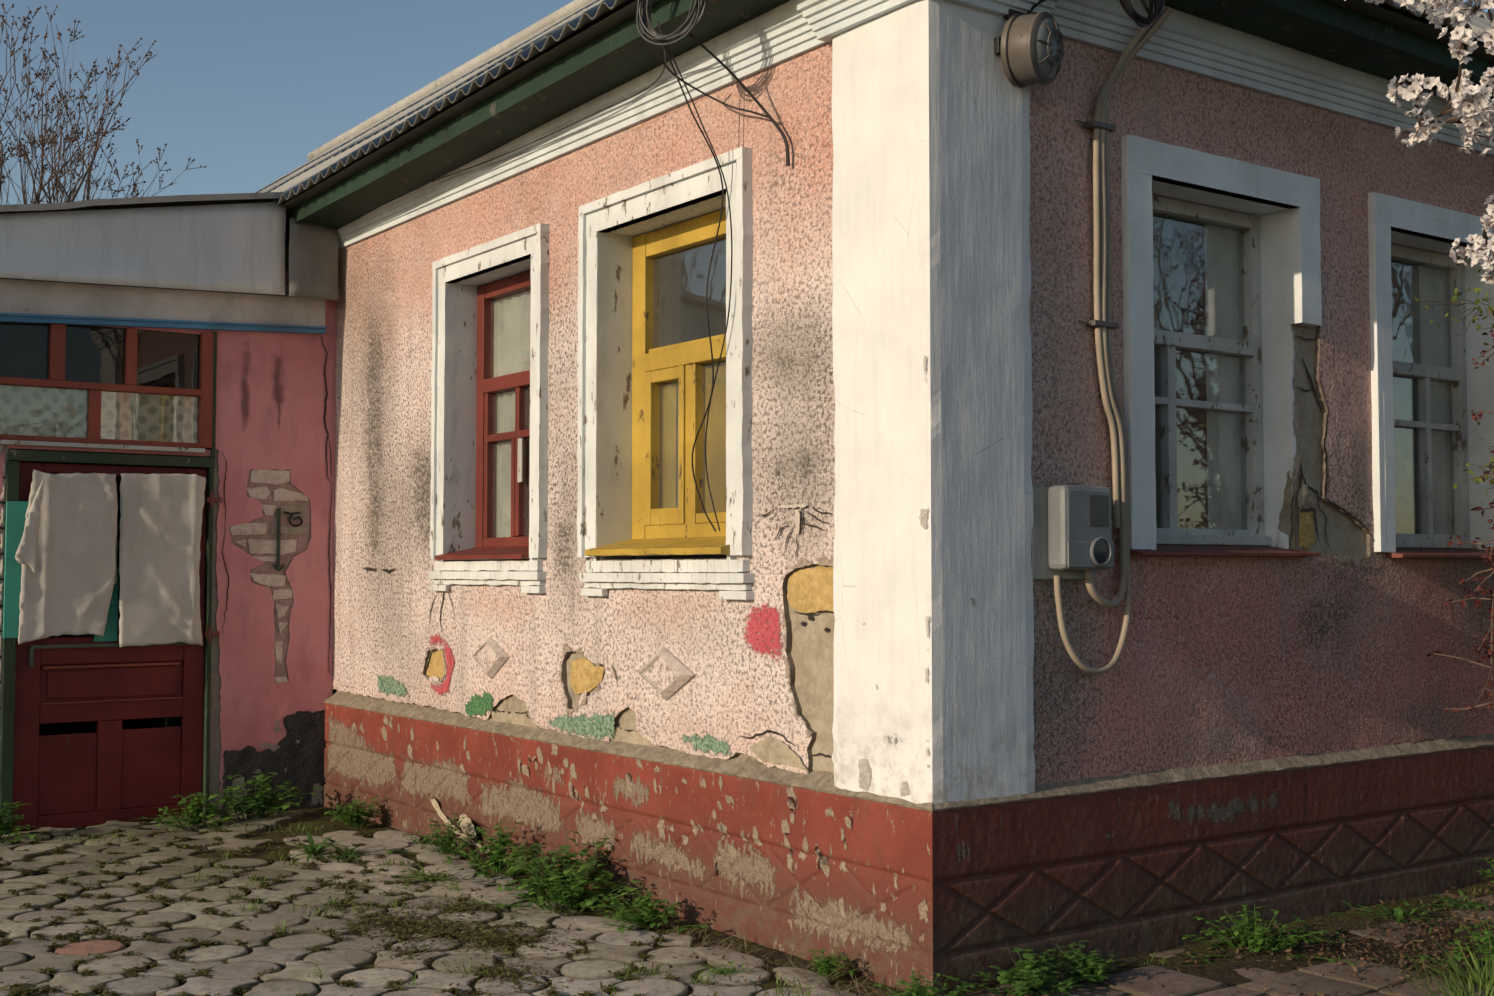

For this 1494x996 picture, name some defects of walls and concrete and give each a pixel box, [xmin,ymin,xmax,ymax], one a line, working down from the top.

crack [320,336,395,673]
spalling [1275,318,1370,567]
flaking render [209,449,311,817]
spalling [421,646,447,683]
spalling [491,695,538,727]
spalling [559,644,617,717]
peeling [310,709,929,960]
spalling [741,554,835,776]
peeling [1167,793,1278,845]